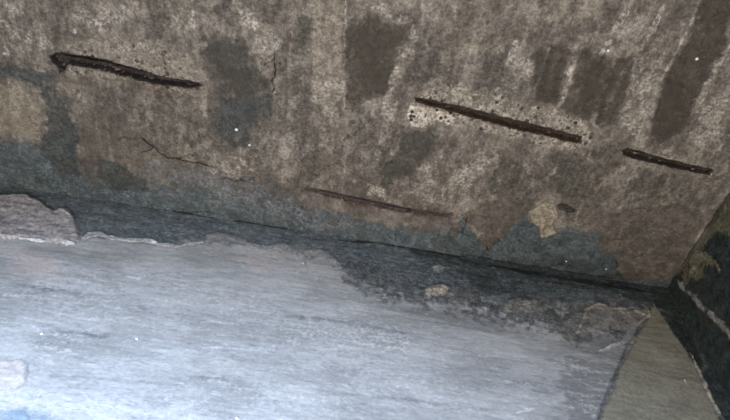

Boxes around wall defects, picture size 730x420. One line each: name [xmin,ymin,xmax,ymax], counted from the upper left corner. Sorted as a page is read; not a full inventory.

damp [206,34,271,148]
damp [342,17,403,105]
damp [531,47,633,127]
damp [651,0,730,141]
crack [118,136,255,184]
peeling [0,194,341,269]
damp [0,65,654,343]
spalling [312,189,445,215]
spalling [529,202,575,238]
peeling [425,284,449,295]
peeling [555,303,651,338]